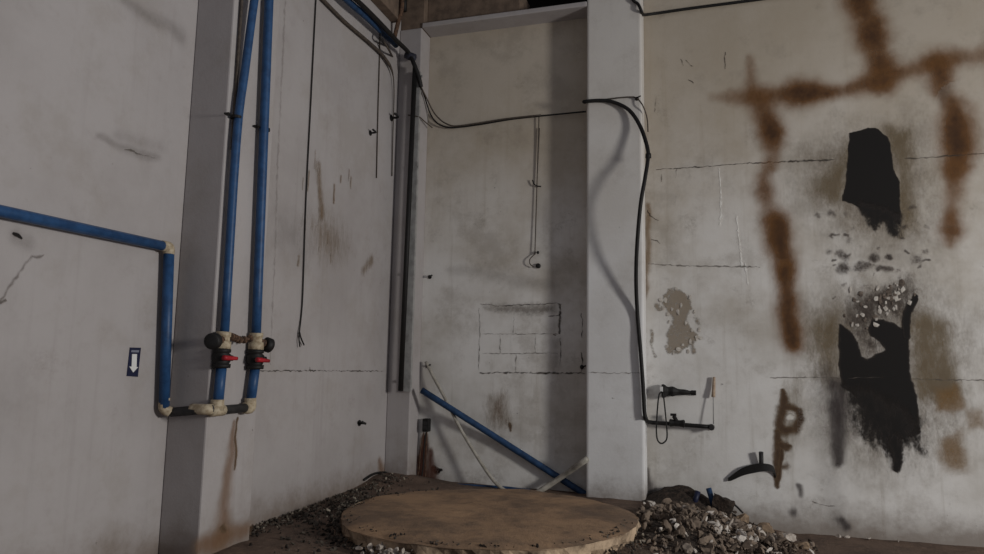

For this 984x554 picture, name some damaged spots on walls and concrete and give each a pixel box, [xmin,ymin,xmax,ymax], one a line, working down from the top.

rust [739,0,973,352]
peeling [655,287,703,354]
peeling [844,279,916,349]
rust [200,417,247,549]
rust [417,434,437,479]